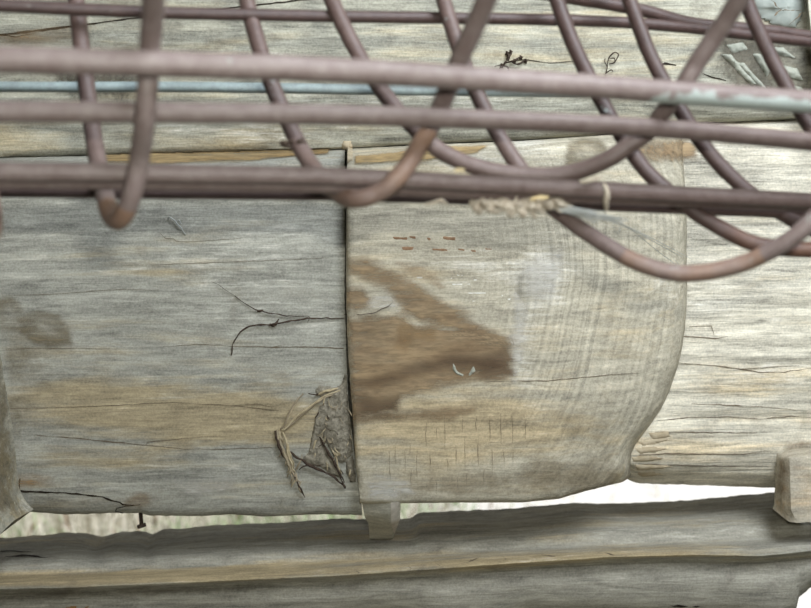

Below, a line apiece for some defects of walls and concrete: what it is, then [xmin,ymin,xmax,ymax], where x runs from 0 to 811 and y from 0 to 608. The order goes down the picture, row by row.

crack [163,342,344,350]
water stain [346,260,525,422]
crack [19,479,140,513]